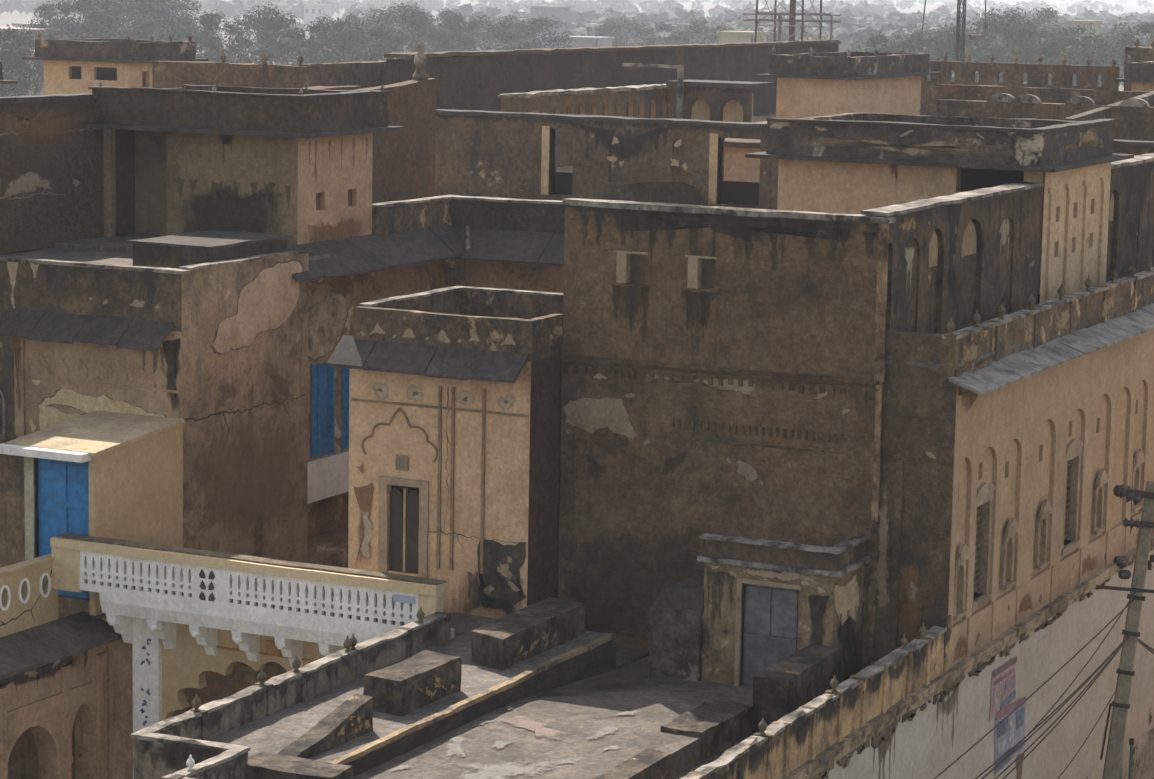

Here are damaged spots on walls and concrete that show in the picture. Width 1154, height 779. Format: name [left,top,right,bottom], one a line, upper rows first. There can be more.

leakage [183,188,277,233]
flaking render [210,258,304,355]
flaking render [29,388,167,433]
crack [185,390,306,440]
flaking render [562,393,651,445]
flaking render [477,540,526,609]
flaking render [711,565,864,628]
leakage [808,595,829,645]
leakage [847,643,928,708]
flaking render [811,577,1111,779]
leakage [796,694,835,743]
leakage [873,724,898,779]